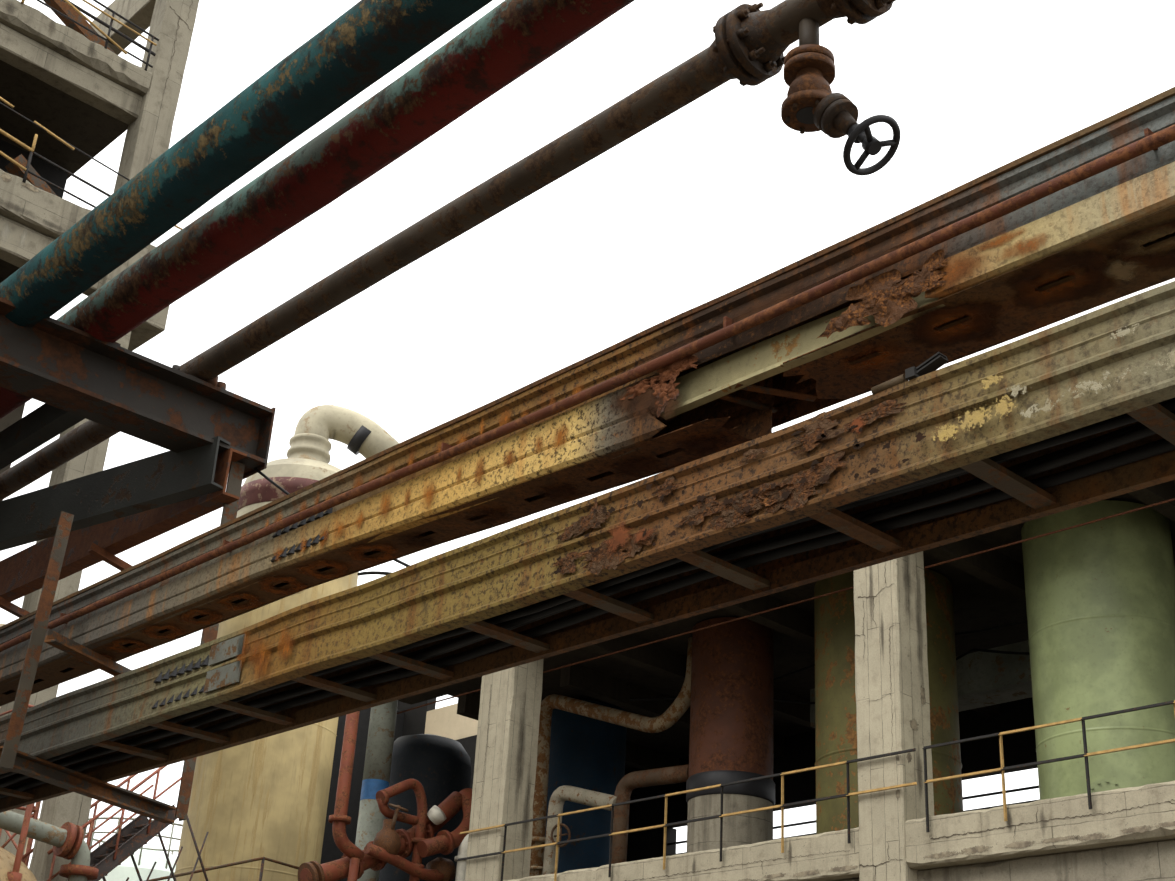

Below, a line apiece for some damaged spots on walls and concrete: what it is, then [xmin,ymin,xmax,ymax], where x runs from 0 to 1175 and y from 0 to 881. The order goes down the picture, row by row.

corrosion [940,231,1045,281]
peeling [1108,262,1134,279]
peeling [1109,323,1139,339]
peeling [932,350,1175,442]
corrosion [684,437,727,456]
corrosion [817,417,865,460]
corrosion [540,486,578,501]
corrosion [584,460,706,554]